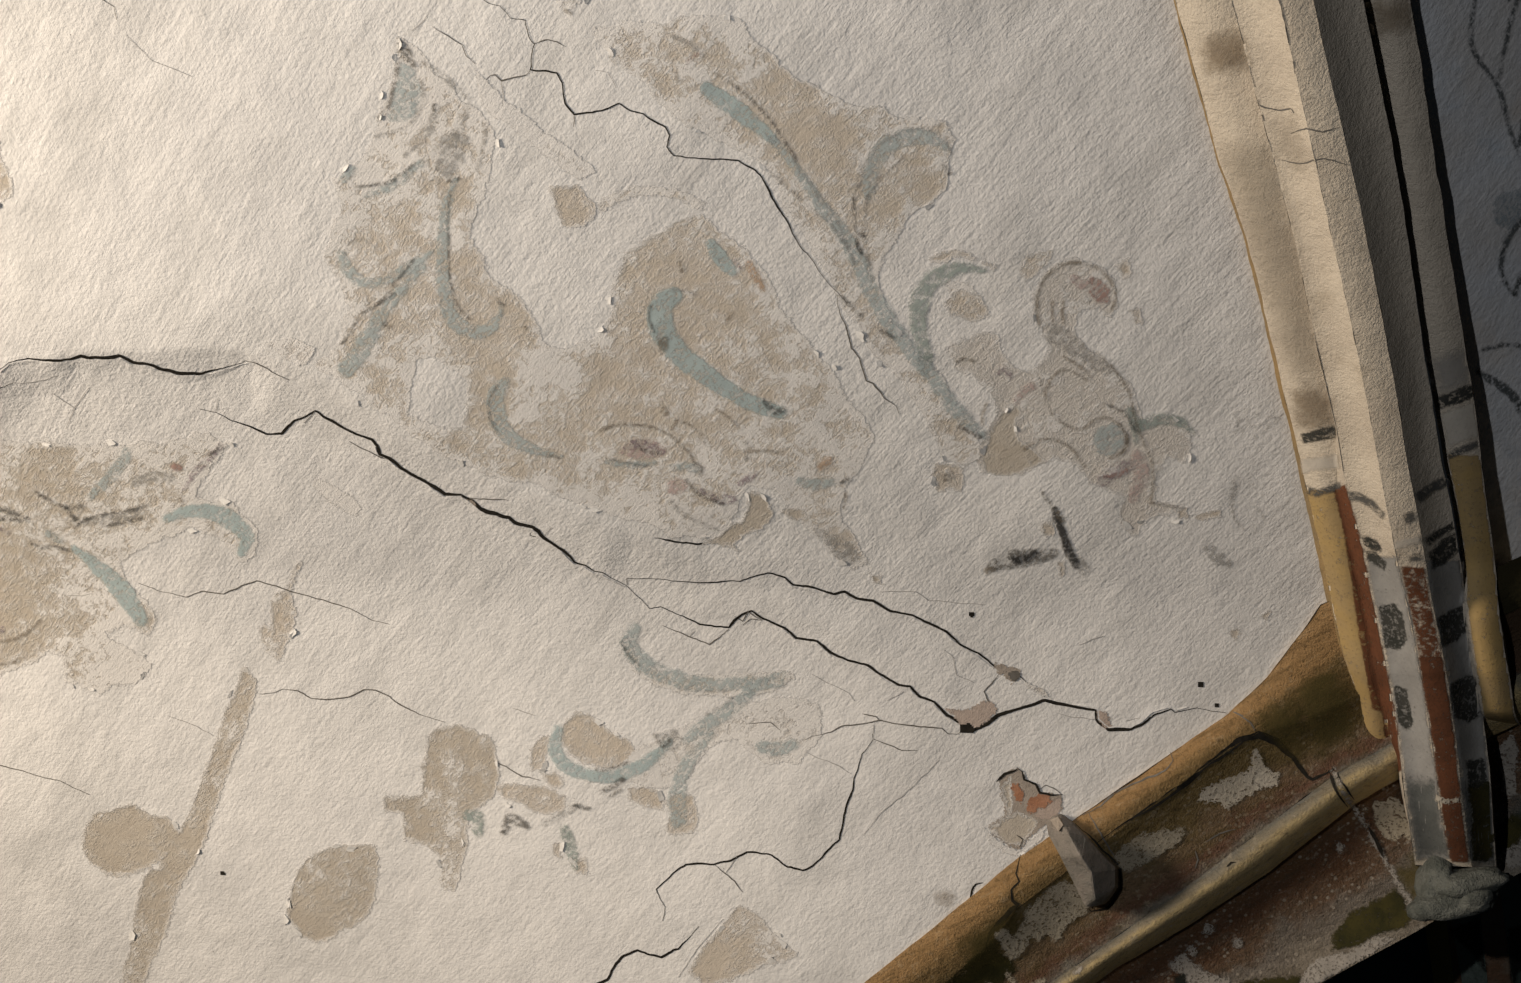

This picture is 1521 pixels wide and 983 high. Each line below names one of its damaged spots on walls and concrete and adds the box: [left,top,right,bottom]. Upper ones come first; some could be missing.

crack [411,0,899,413]
crack [0,354,1354,983]
flaking render [988,767,1063,850]